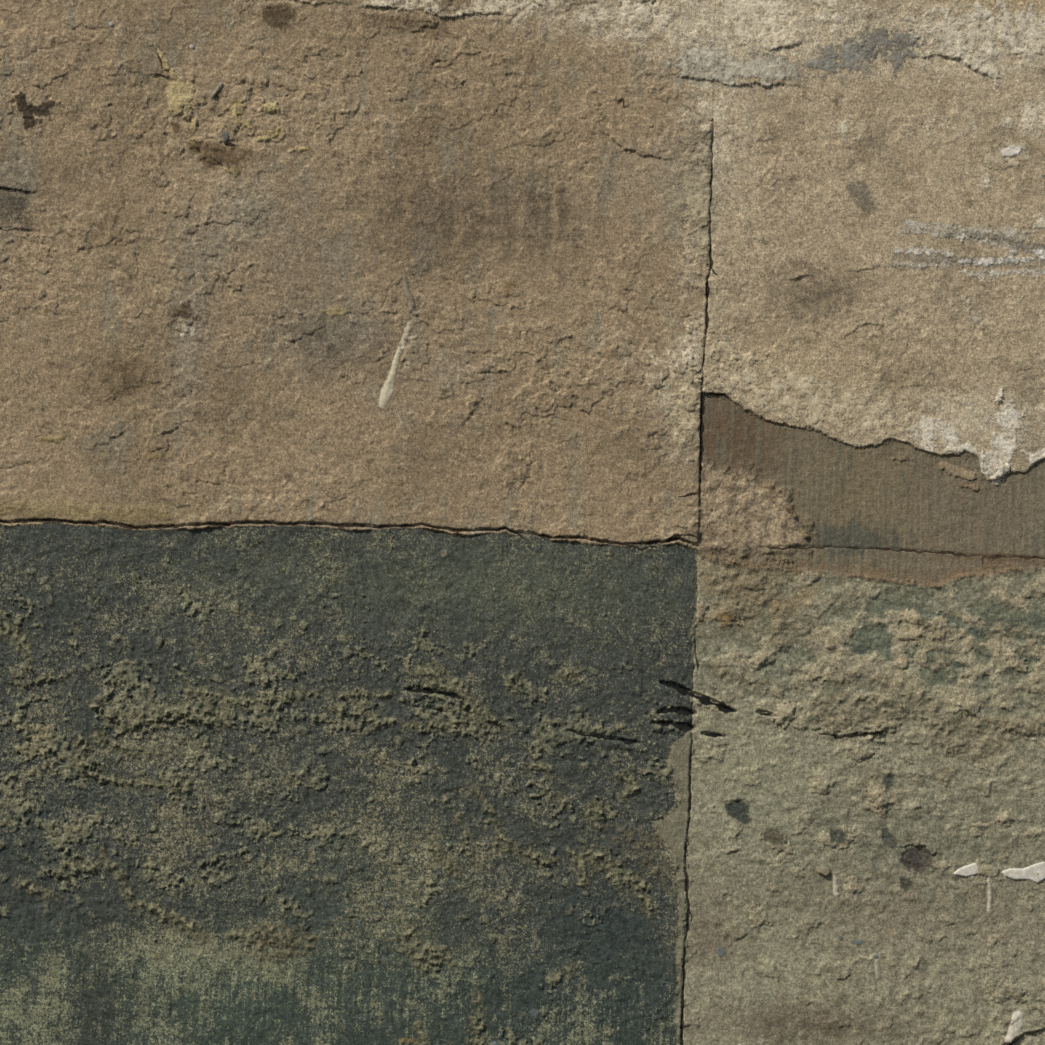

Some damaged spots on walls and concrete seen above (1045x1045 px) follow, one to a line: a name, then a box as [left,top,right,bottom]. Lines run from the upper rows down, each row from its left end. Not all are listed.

crack [678,138,728,506]
crack [0,518,697,550]
spalling [698,393,1045,589]
crack [680,747,693,1045]